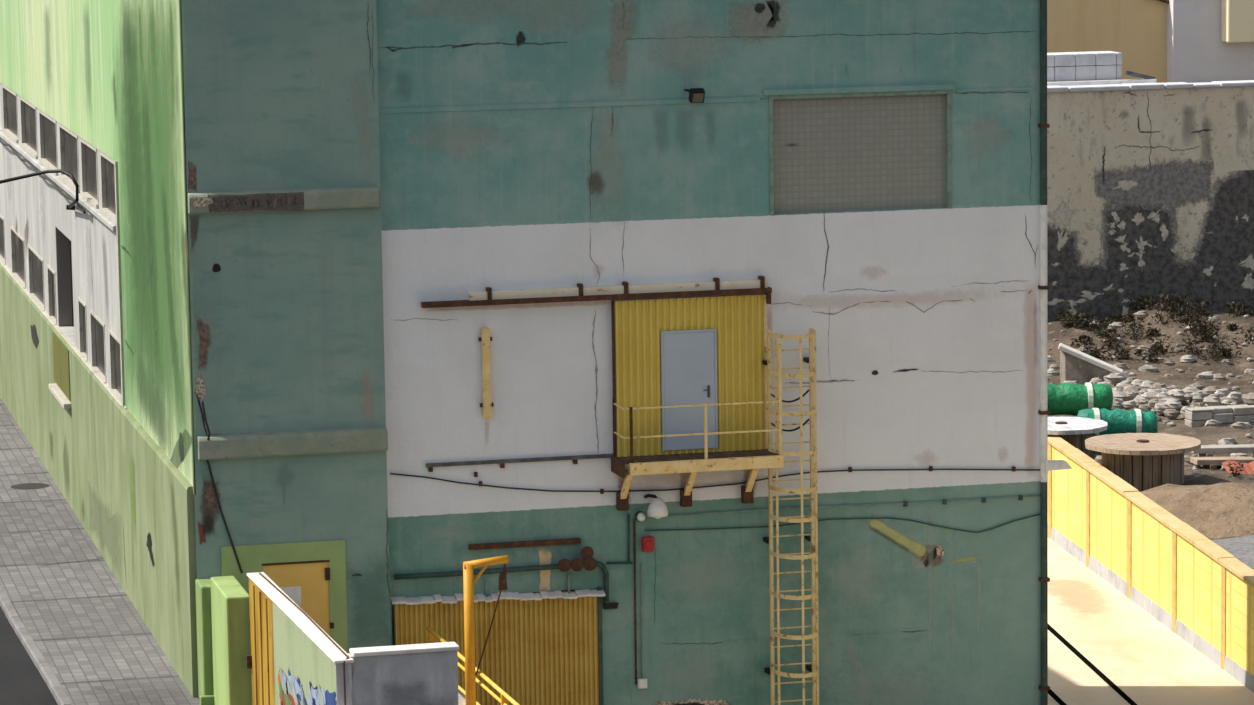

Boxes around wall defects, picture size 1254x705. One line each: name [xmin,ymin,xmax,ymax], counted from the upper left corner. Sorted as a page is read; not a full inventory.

crack [367,17,568,97]
peeling [754,0,780,28]
crack [1101,92,1210,184]
water stain [120,1,185,423]
peeling [188,163,304,213]
crack [590,111,625,283]
crack [776,91,1037,384]
peeling [1047,159,1254,323]
peeling [195,320,210,401]
crack [591,314,599,450]
spalling [198,481,219,544]